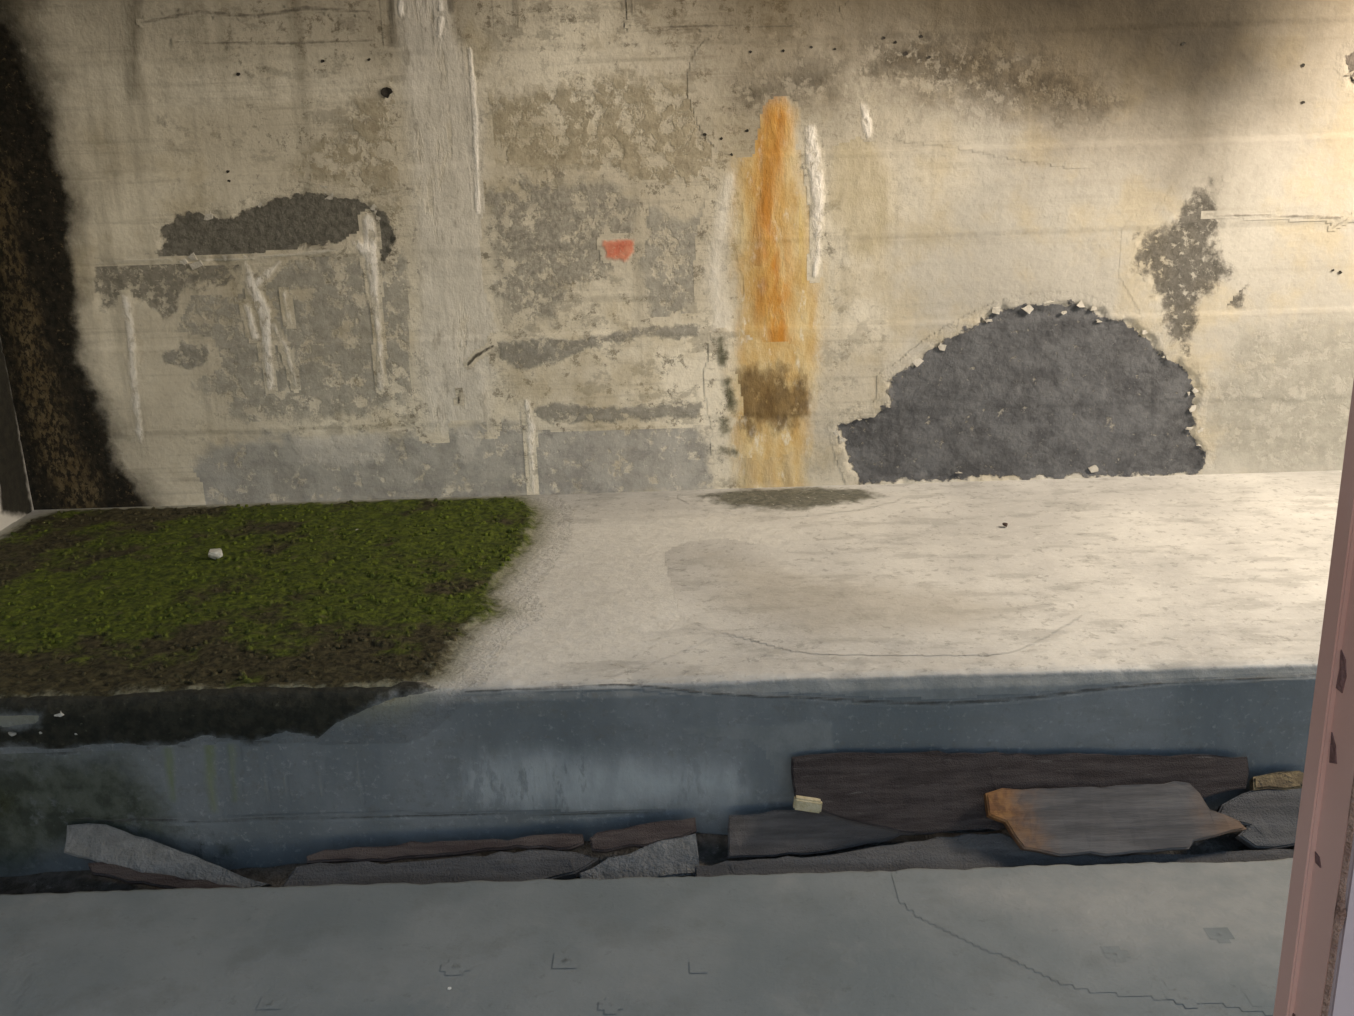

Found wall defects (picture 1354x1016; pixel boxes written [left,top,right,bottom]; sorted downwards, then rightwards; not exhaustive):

peeling [91,49,414,431]
damp [0,0,717,524]
rust [693,96,846,489]
damp [492,0,1354,474]
spalling [828,158,1256,485]
spalling [1336,38,1354,97]